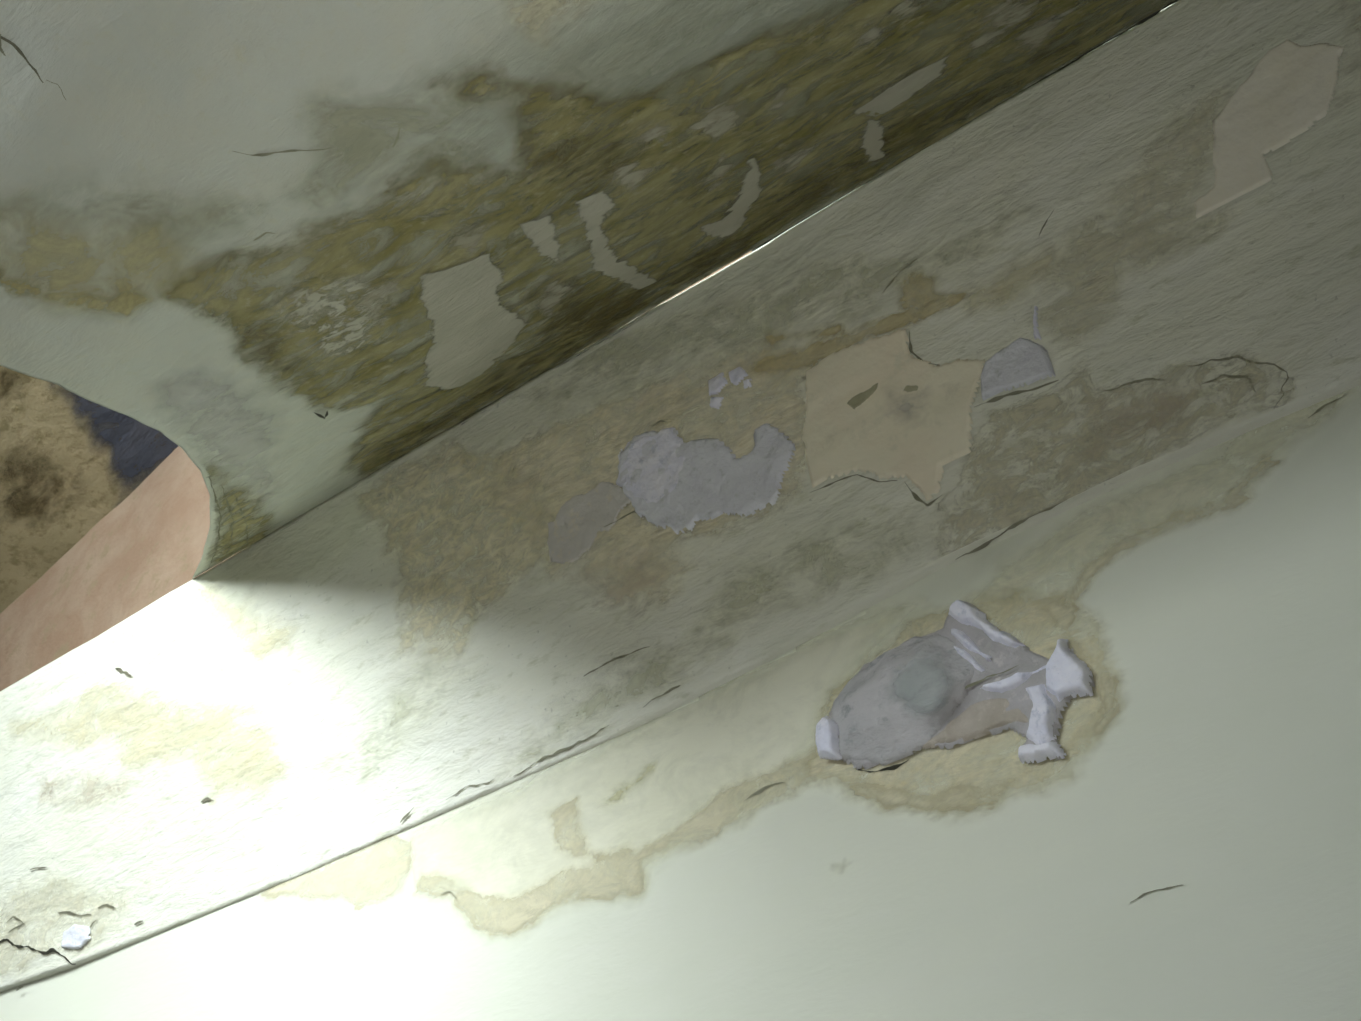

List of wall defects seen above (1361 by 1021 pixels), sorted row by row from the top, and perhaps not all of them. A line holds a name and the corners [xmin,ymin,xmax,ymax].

crack [0,34,66,100]
peeling [1193,39,1345,218]
water stain [0,0,1174,655]
peeling [547,306,1058,564]
water stain [943,355,1331,550]
water stain [262,465,1244,934]
spalling [815,600,1095,773]
crack [0,916,76,965]
crack [58,904,143,927]